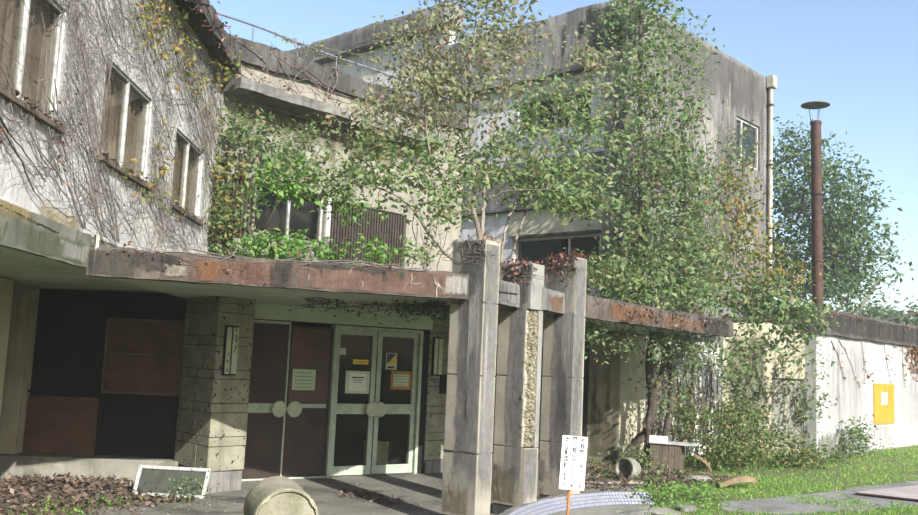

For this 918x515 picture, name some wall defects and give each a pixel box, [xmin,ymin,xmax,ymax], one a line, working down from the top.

leakage [0,199,41,236]
rust [299,264,450,296]
rust [612,304,654,324]